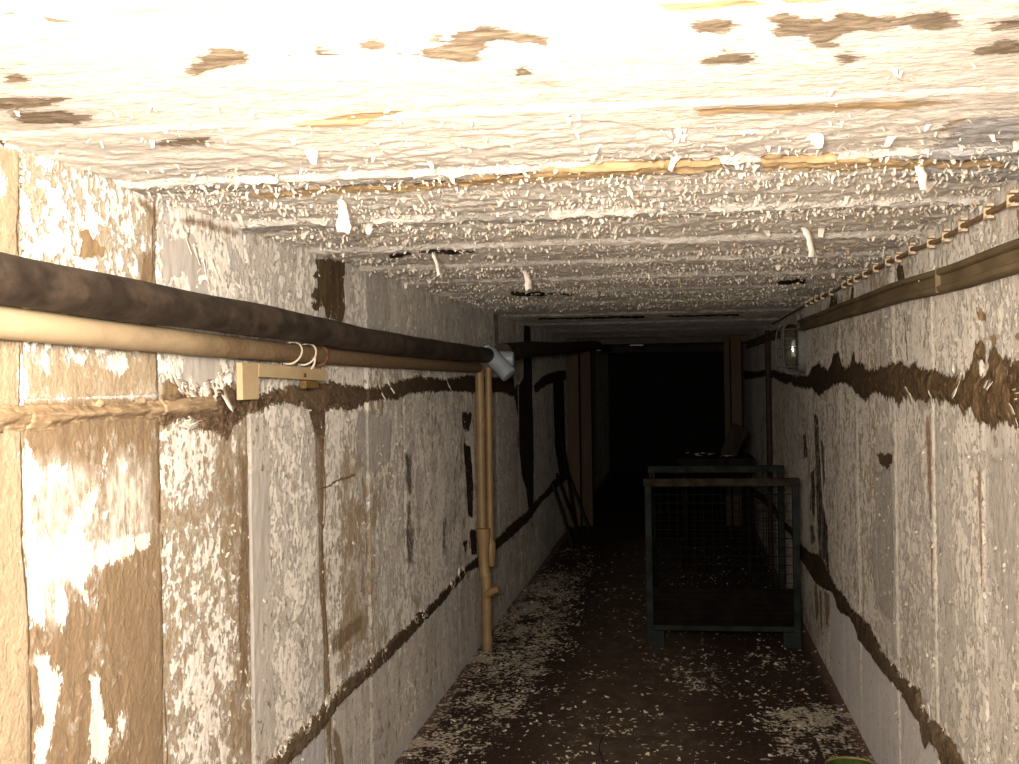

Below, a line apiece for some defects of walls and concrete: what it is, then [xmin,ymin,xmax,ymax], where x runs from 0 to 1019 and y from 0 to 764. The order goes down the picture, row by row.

peeling [181,47,250,76]
peeling [395,24,552,62]
peeling [699,48,759,64]
peeling [766,0,962,66]
peeling [965,18,1019,69]
peeling [127,89,1019,342]
peeling [17,437,151,634]
crack [320,450,356,695]
spalling [157,354,850,764]
spalling [743,285,1019,764]
peeling [33,650,63,764]
peeling [87,671,126,764]